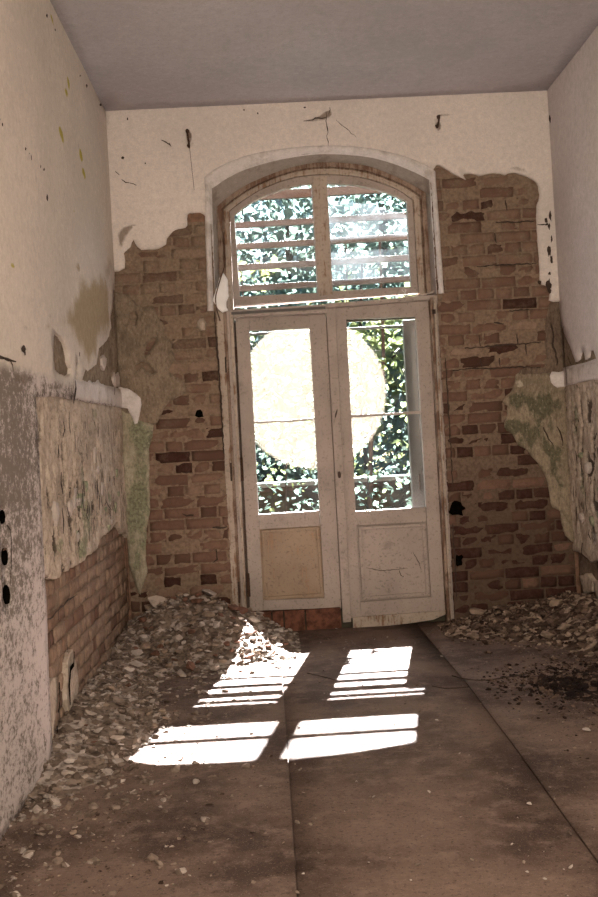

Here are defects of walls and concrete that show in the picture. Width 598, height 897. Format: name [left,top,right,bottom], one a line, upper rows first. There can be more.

damp [44,224,136,371]
spalling [36,221,233,739]
crack [306,111,356,143]
spalling [430,166,598,619]